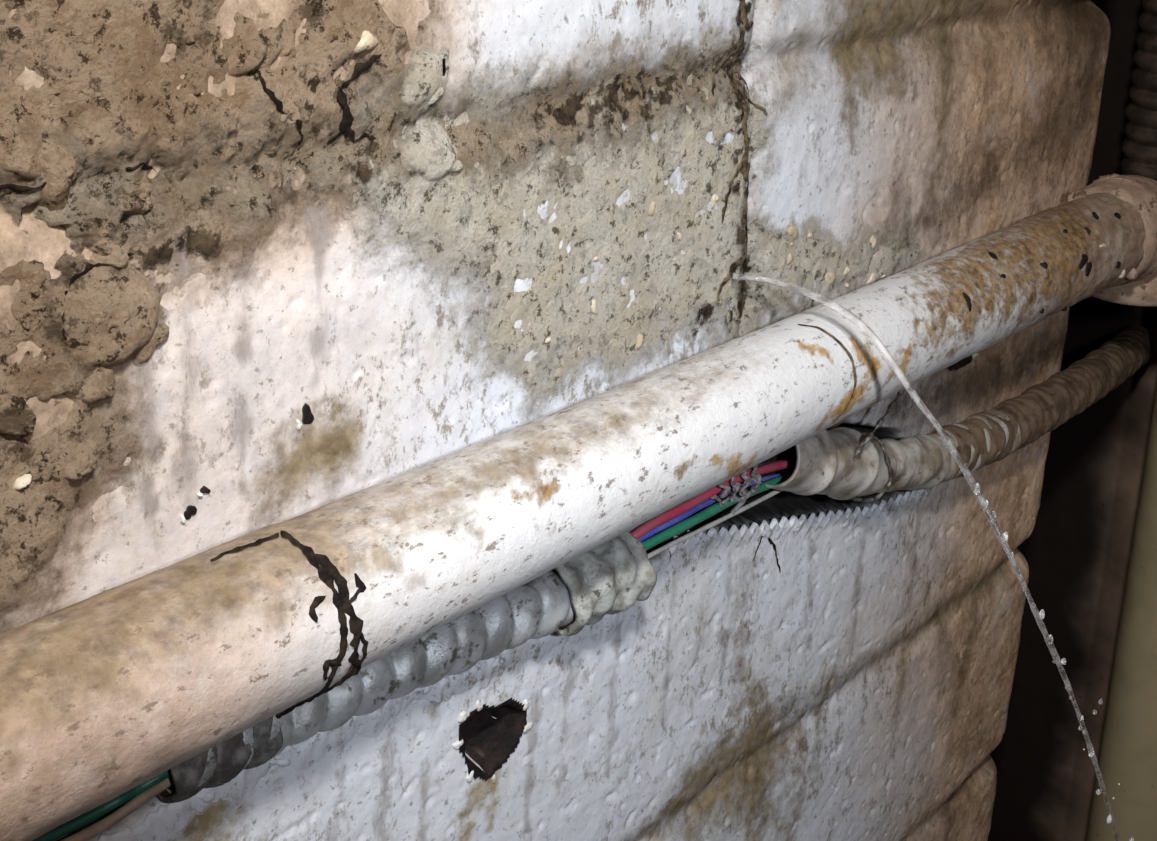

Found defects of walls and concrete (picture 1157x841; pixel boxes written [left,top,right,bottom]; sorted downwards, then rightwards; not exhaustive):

crack [257,69,304,146]
crack [331,54,382,144]
crack [711,0,768,316]
spalling [0,0,928,633]
flaking render [98,607,632,841]
water stain [656,696,802,841]